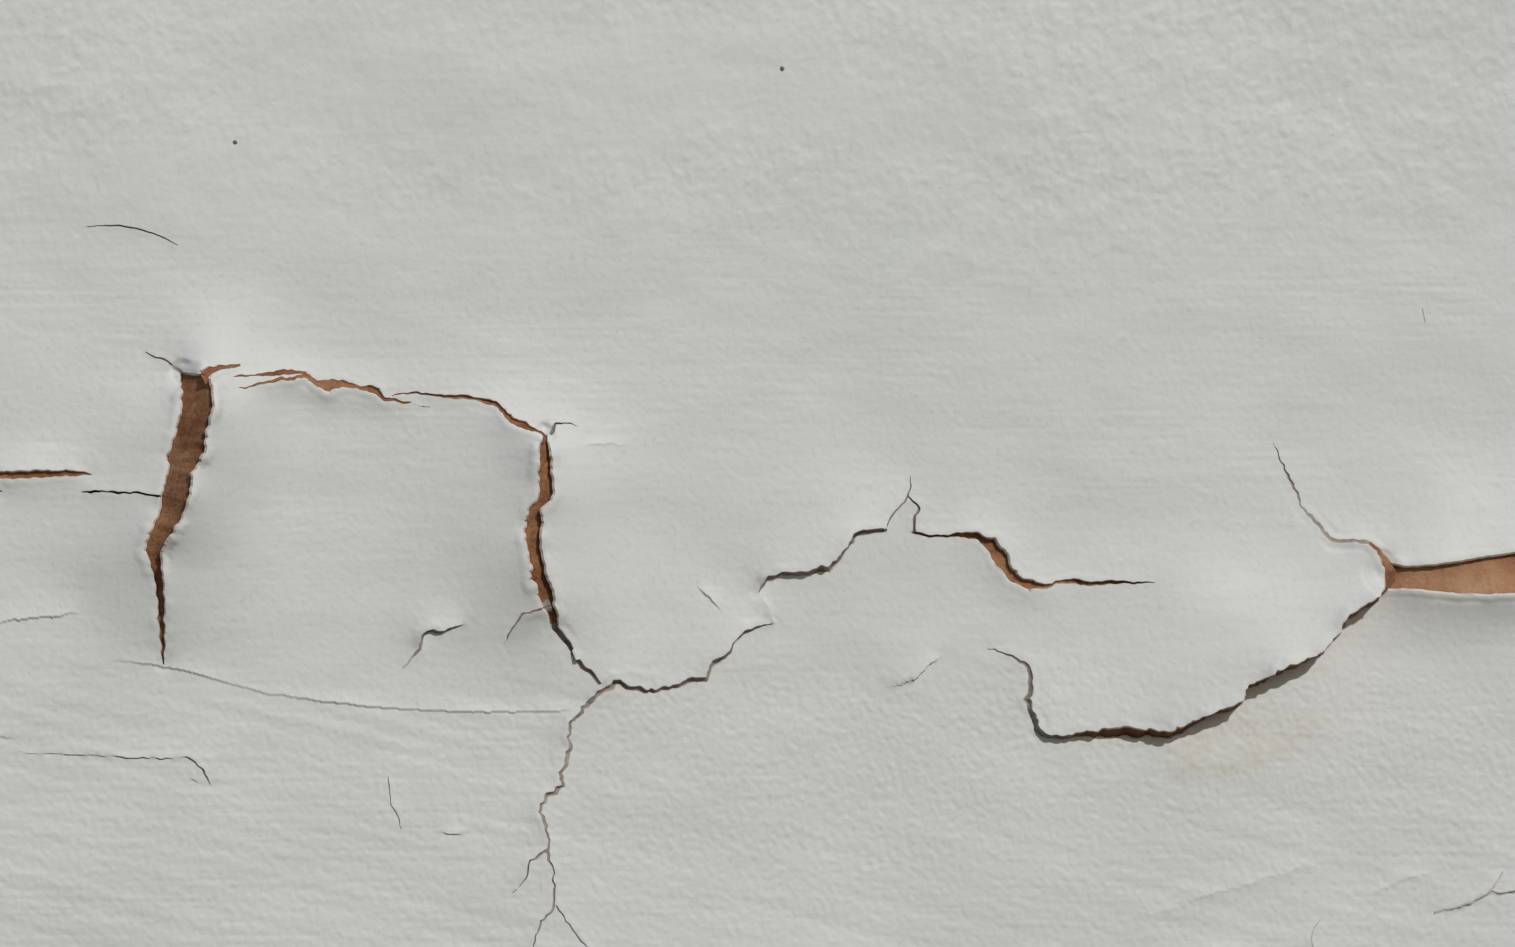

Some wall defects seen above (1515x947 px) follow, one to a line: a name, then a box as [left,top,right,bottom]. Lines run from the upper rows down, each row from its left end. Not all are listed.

peeling [46,283,915,707]
crack [906,493,1154,606]
peeling [983,440,1397,743]
crack [105,656,599,947]